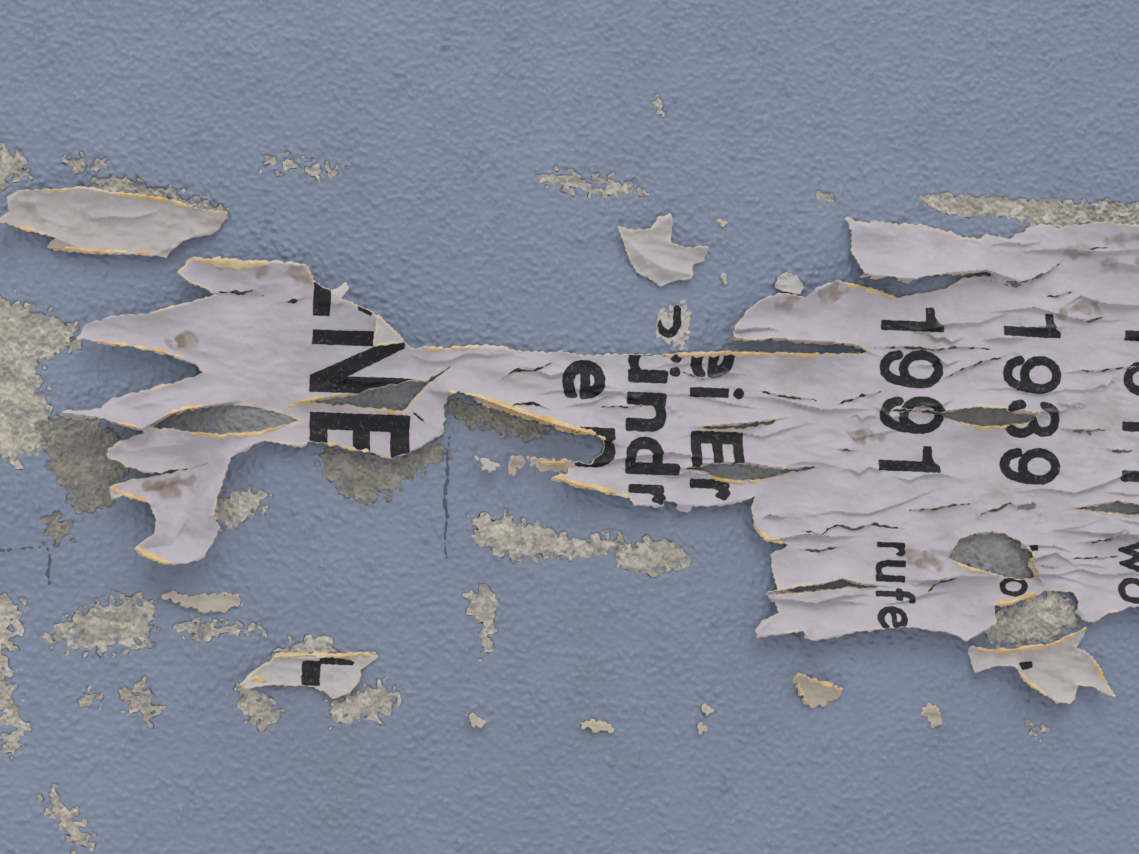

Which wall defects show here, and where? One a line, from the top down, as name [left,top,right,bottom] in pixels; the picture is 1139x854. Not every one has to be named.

flaking render [0,142,33,192]
flaking render [535,166,650,202]
flaking render [919,192,1139,228]
flaking render [0,290,129,548]
flaking render [467,509,693,577]
flaking render [39,590,267,660]
flaking render [460,584,499,662]
flaking render [0,592,32,760]
flaking render [119,676,166,729]
flaking render [234,682,285,732]
flaking render [324,677,402,730]
flaking render [37,784,96,854]